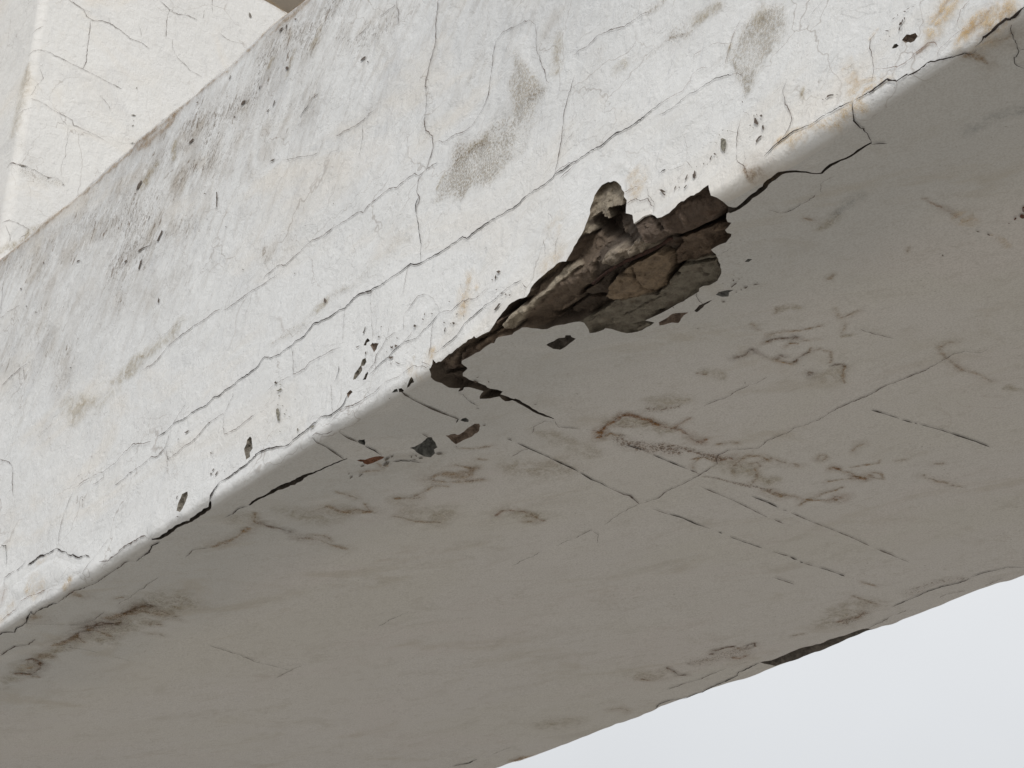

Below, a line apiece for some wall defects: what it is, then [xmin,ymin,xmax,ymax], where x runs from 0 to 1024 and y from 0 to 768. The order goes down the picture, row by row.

crack [728,5,1024,213]
crack [0,0,741,658]
spalling [429,130,758,401]
corrosion [596,406,786,497]
crack [513,351,989,584]
crack [871,567,1020,627]